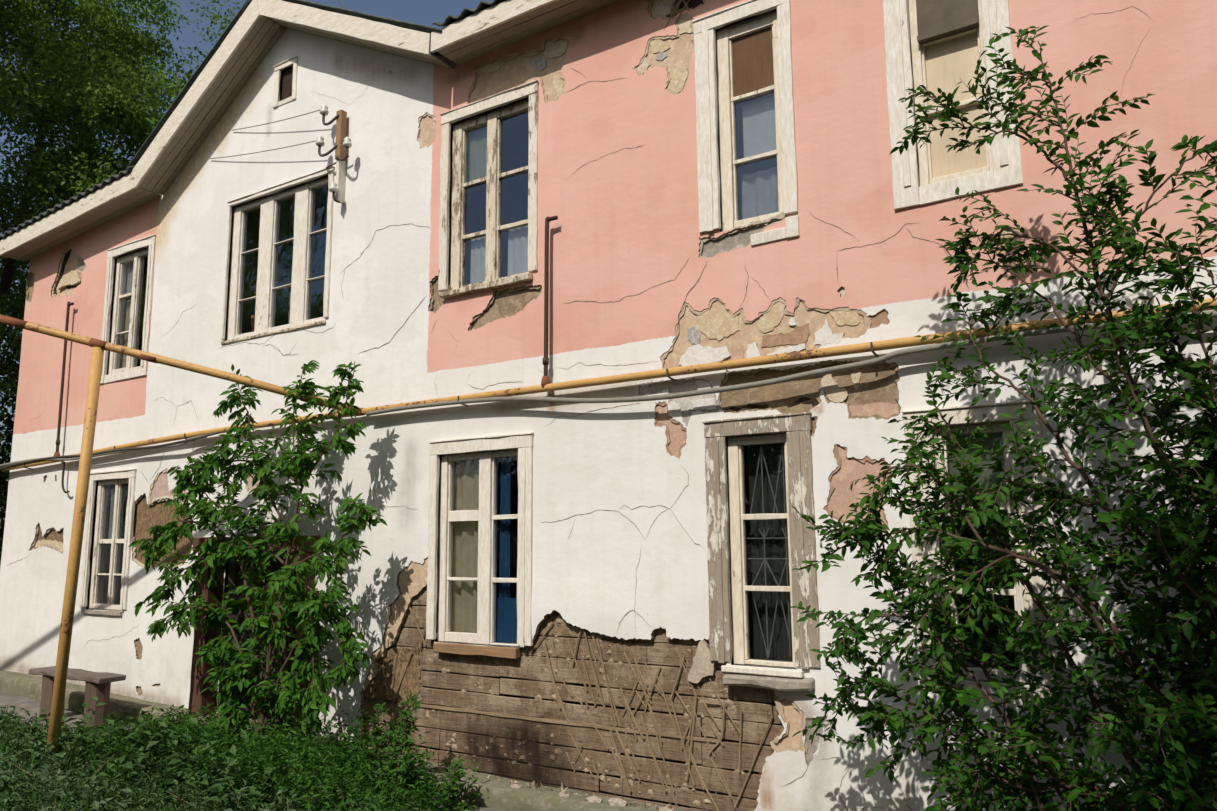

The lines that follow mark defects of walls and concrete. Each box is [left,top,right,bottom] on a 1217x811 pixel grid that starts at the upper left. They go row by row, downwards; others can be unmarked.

peeling [468,39,570,104]
crack [341,224,431,295]
crack [358,300,458,354]
flaking render [469,285,542,331]
crack [571,257,707,332]
flaking render [699,211,787,259]
peeling [638,287,901,458]
flaking render [30,525,64,553]
flaking render [133,469,193,567]
crack [545,466,704,631]
peeling [824,444,891,538]
flaking render [363,558,828,811]